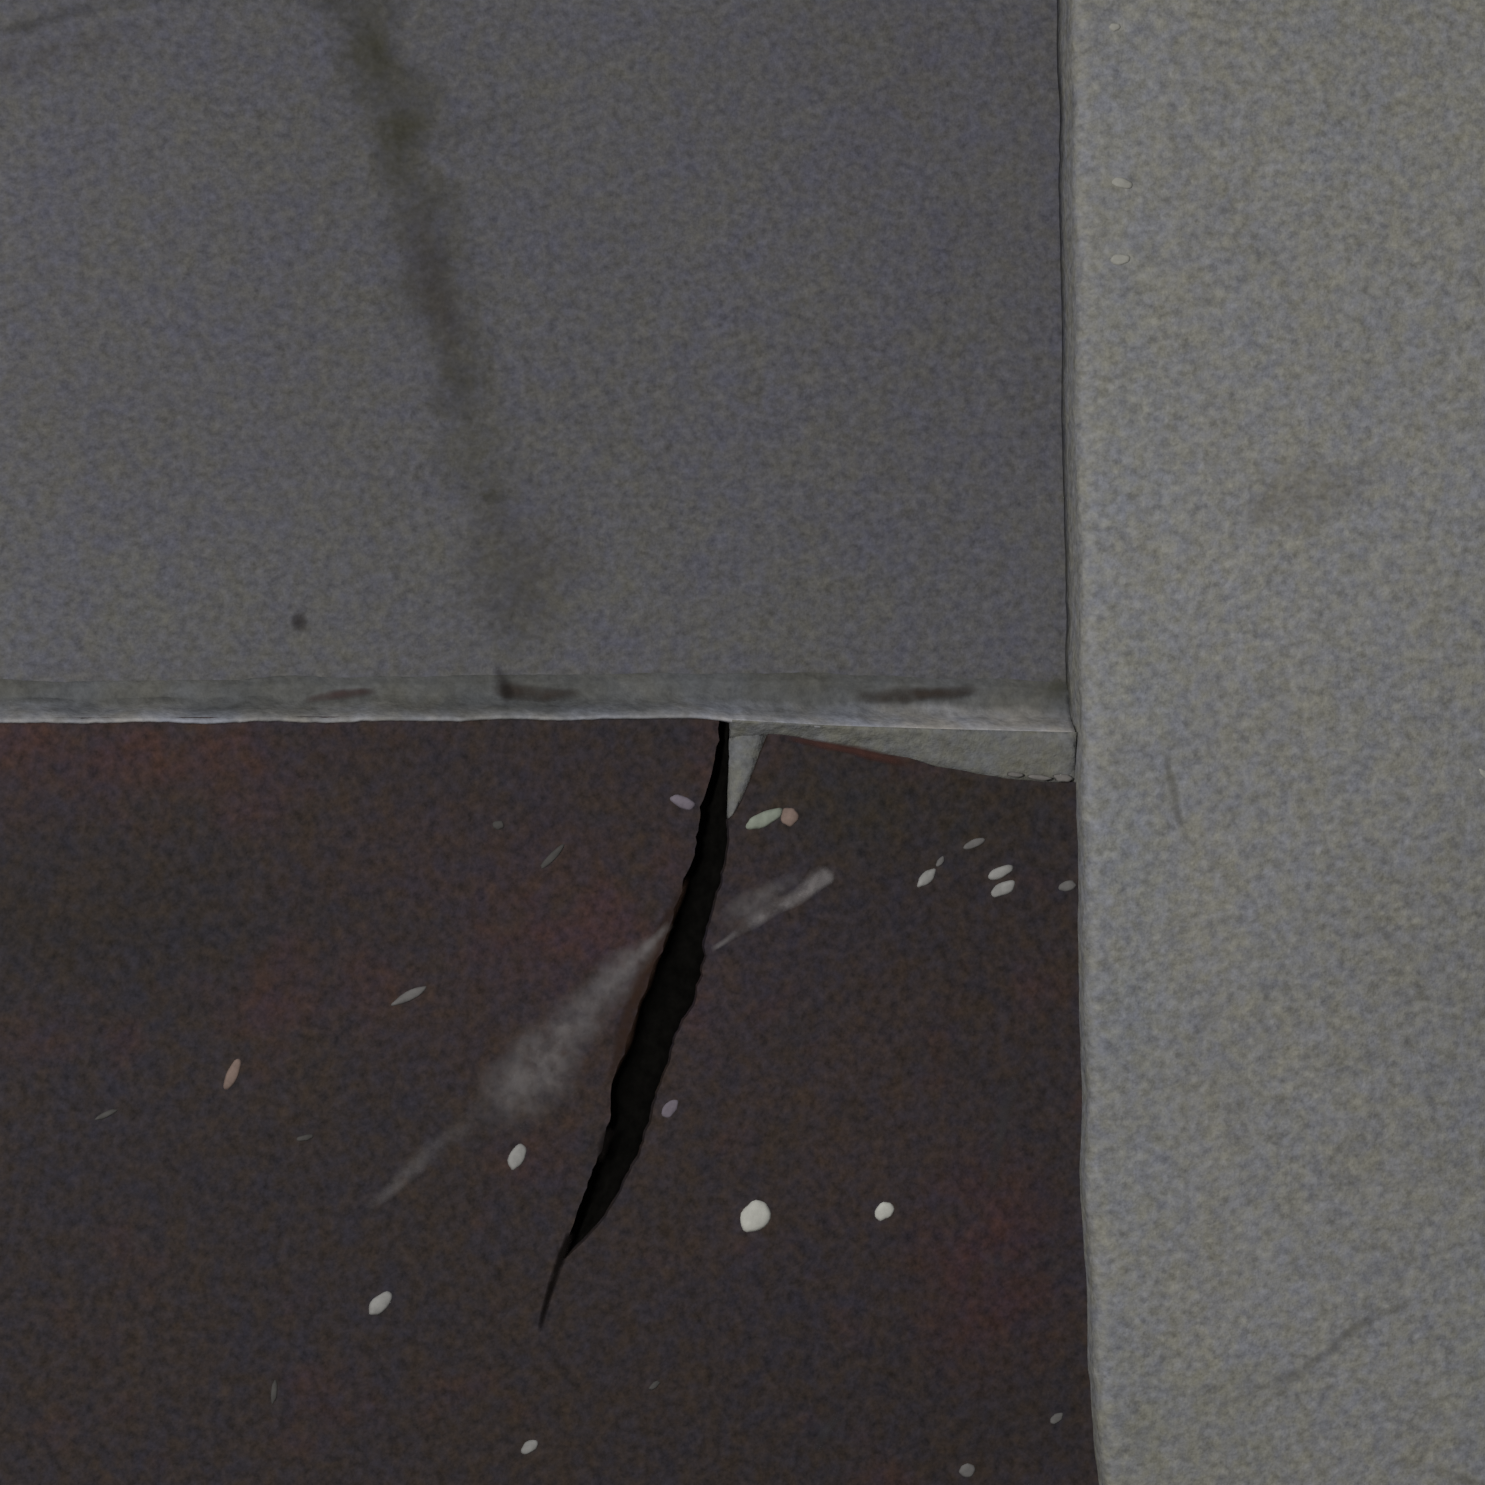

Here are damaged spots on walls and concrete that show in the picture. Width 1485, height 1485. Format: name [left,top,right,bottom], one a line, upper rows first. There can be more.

crack [540,721,730,1323]